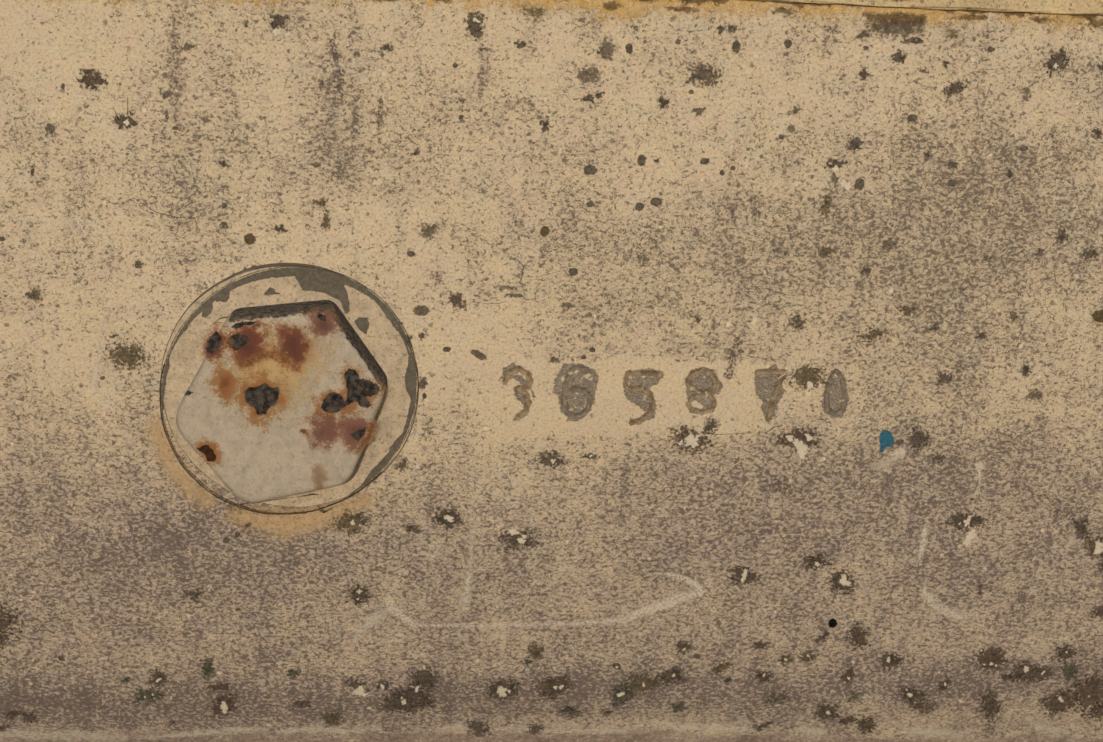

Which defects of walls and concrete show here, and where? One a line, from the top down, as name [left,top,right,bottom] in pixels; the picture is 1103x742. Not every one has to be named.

rust [202,309,382,451]
rust [196,440,222,465]